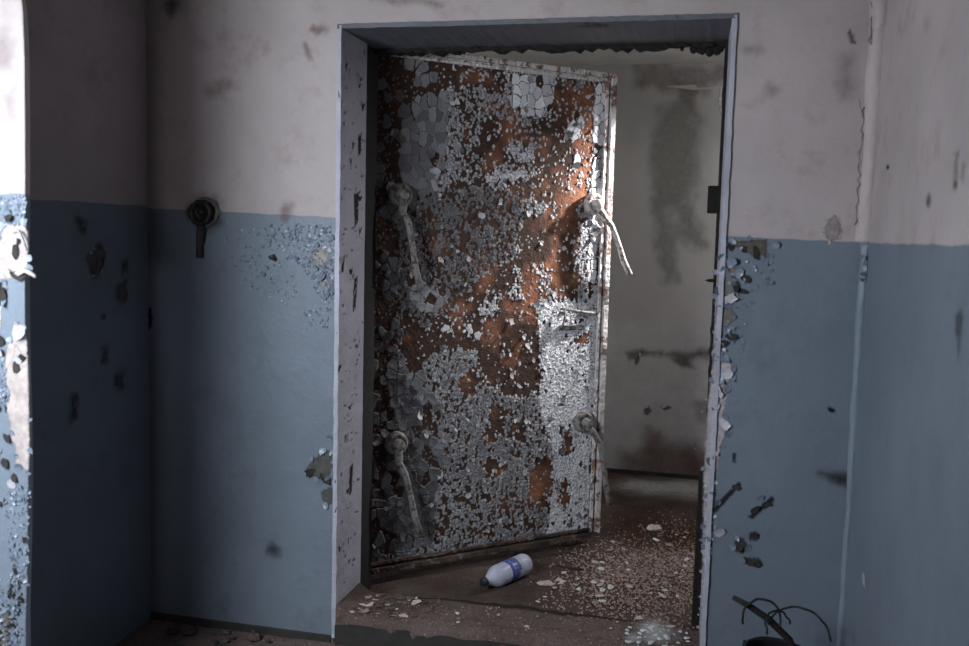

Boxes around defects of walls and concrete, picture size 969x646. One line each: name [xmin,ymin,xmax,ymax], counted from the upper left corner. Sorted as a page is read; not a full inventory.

peeling [562,121,601,153]
water stain [636,64,724,273]
peeling [340,189,363,315]
peeling [493,198,533,260]
peeling [591,216,601,241]
peeling [534,291,564,316]
peeling [496,334,555,397]
peeling [0,194,33,646]
peeling [303,387,360,521]
peeling [403,393,429,453]
peeling [543,391,576,437]
peeling [609,235,780,646]